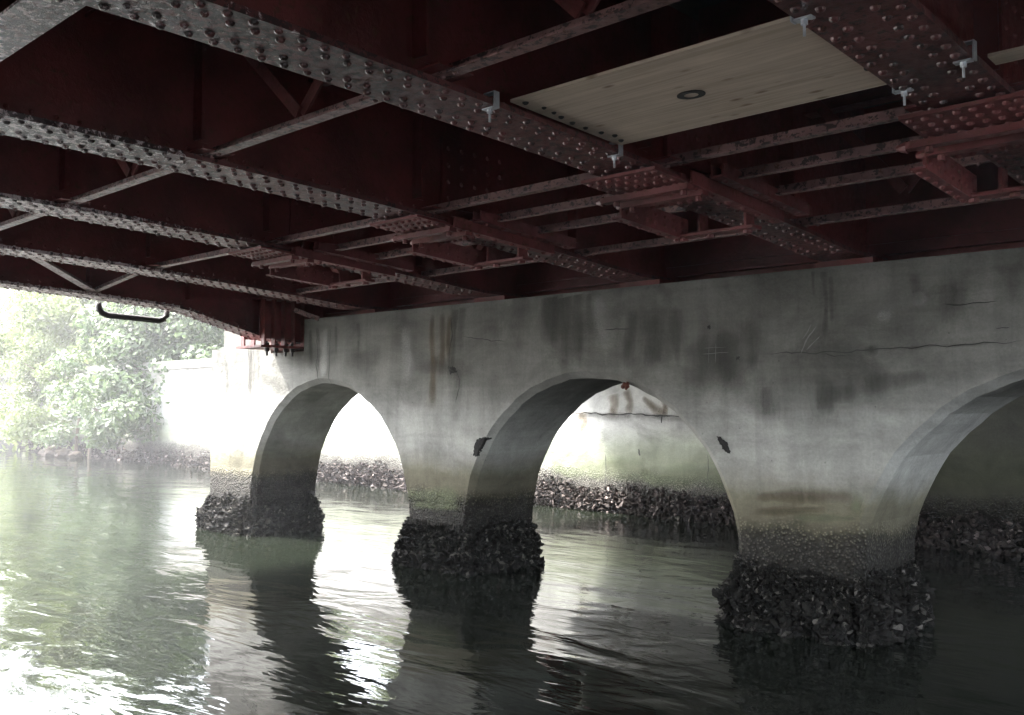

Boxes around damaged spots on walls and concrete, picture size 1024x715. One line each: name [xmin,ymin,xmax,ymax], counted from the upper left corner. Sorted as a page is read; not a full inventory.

crack [775,327,1016,357]